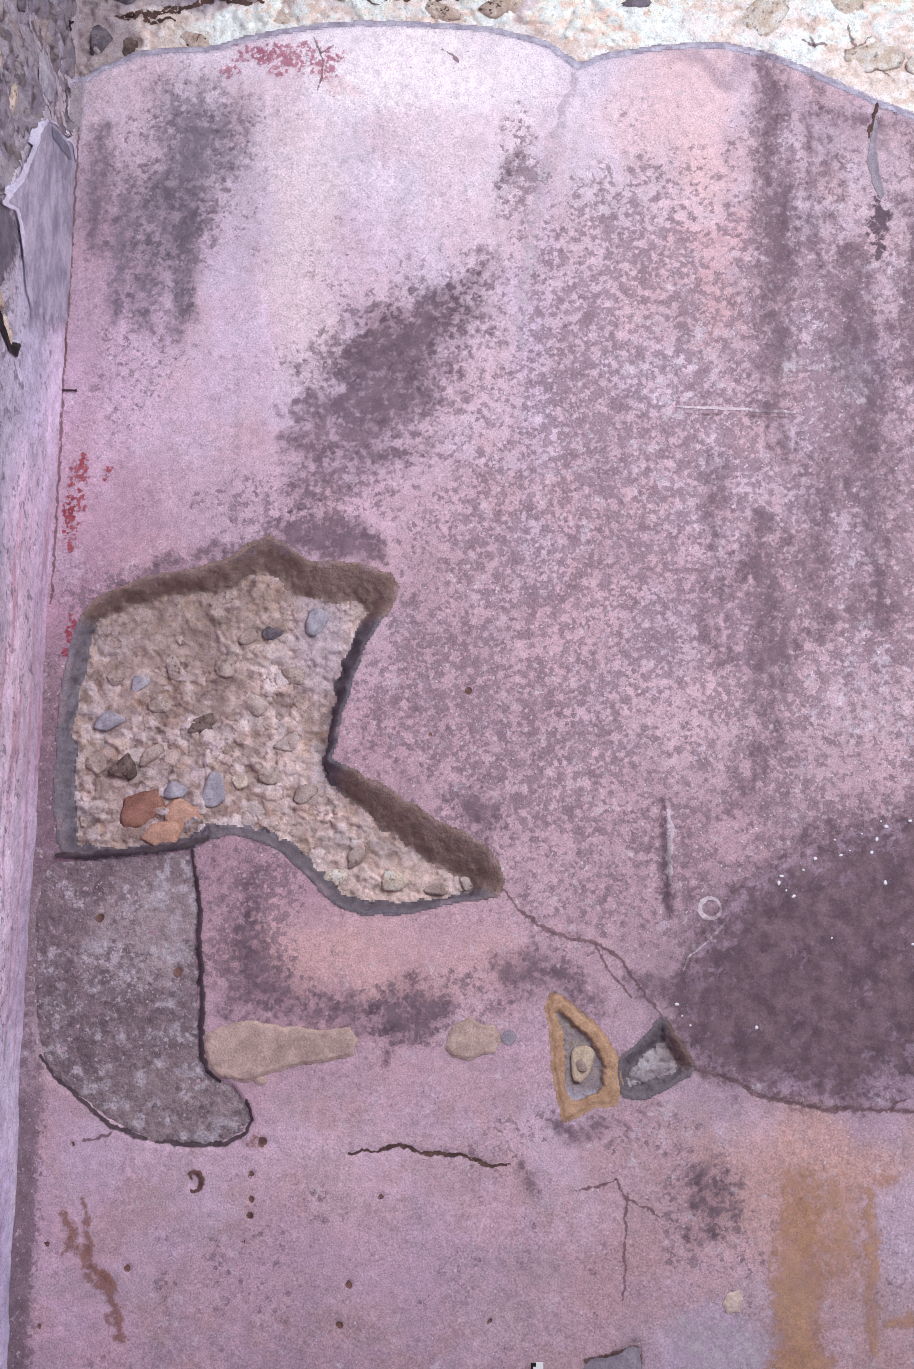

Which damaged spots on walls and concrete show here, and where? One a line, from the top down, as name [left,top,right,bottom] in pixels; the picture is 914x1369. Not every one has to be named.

spalling [0,290,21,357]
leakage [268,250,504,565]
leakage [761,310,802,420]
flaking render [35,535,505,1147]
leakage [495,947,605,1014]
crack [505,890,663,1017]
leakage [624,799,914,1113]
flaking render [545,992,695,1123]
rust [59,1197,125,1343]
spalling [188,1169,205,1193]
crack [348,1143,511,1168]
crack [581,1178,660,1301]